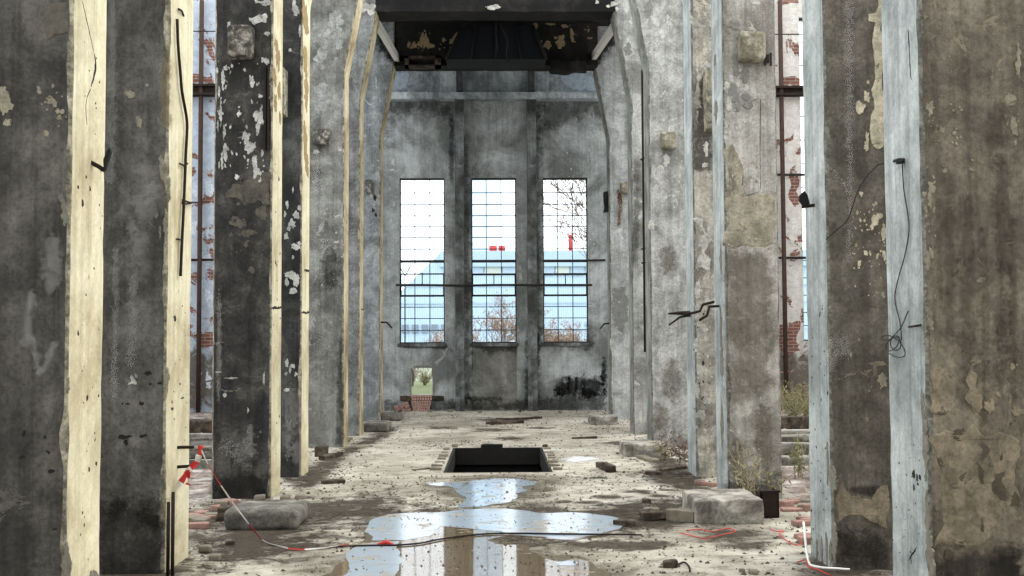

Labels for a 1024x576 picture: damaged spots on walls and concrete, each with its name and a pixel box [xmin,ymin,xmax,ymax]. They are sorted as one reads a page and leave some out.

crack [82,1,96,122]
spalling [191,0,344,294]
peeling [407,30,458,51]
damp [376,33,615,411]
peeling [533,23,593,55]
spalling [653,54,716,123]
spalling [668,53,801,452]
peeling [782,0,799,44]
peeling [856,0,884,151]
peeling [779,98,1024,576]